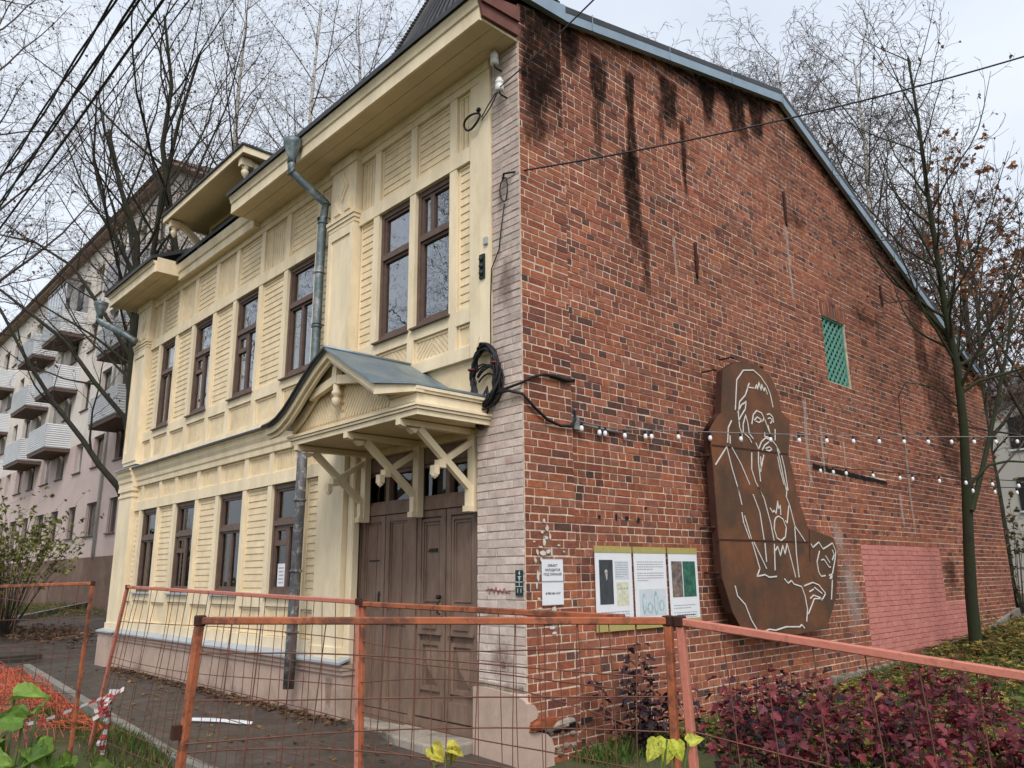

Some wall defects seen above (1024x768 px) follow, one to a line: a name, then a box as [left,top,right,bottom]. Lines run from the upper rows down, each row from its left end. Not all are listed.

water stain [520,1,607,151]
water stain [622,70,650,286]
water stain [658,65,771,195]